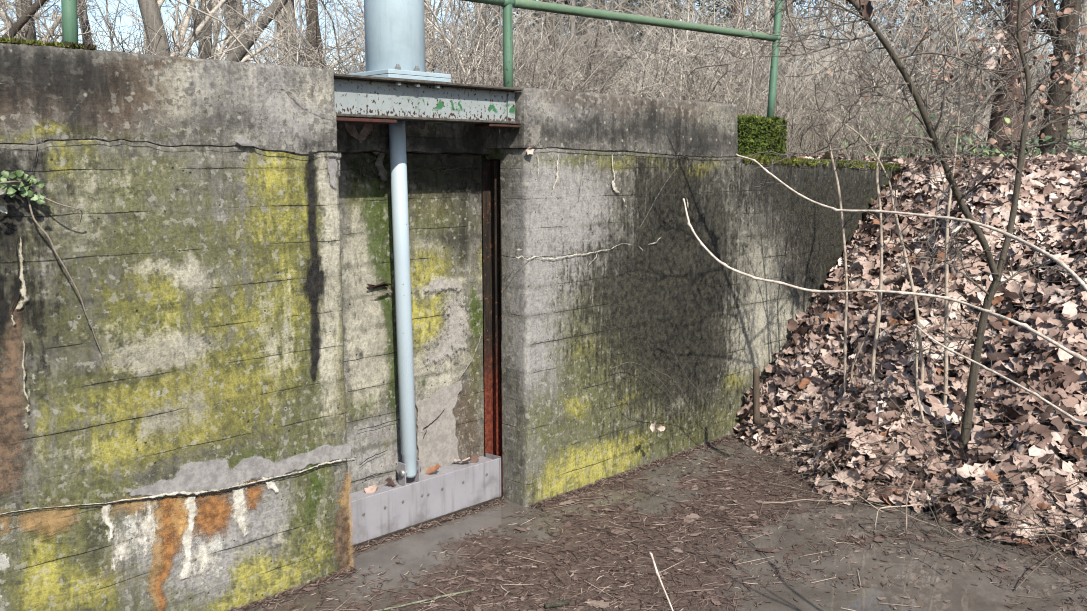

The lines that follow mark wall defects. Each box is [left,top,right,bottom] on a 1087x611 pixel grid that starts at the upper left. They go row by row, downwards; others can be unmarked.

crack [2,83,375,175]
crack [516,147,738,261]
crack [10,236,29,325]
damp [304,152,325,381]
damp [554,153,892,456]
crack [0,409,445,515]
peeling [127,443,351,496]
rust [0,508,78,535]
damp [102,502,158,570]
rust [117,492,233,611]
damp [180,493,216,579]
rust [334,475,353,571]